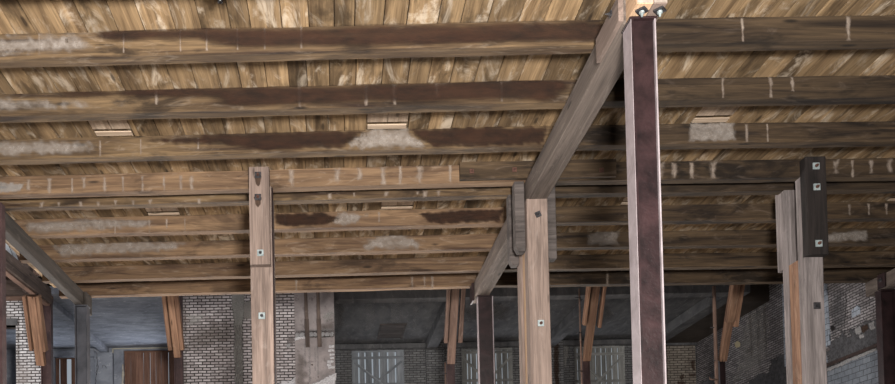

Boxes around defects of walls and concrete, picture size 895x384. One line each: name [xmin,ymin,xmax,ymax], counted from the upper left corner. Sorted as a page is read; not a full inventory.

water stain [276,212,338,226]
water stain [422,210,503,224]
peeling [855,321,875,339]
spalling [286,330,337,384]
spalling [827,349,877,371]